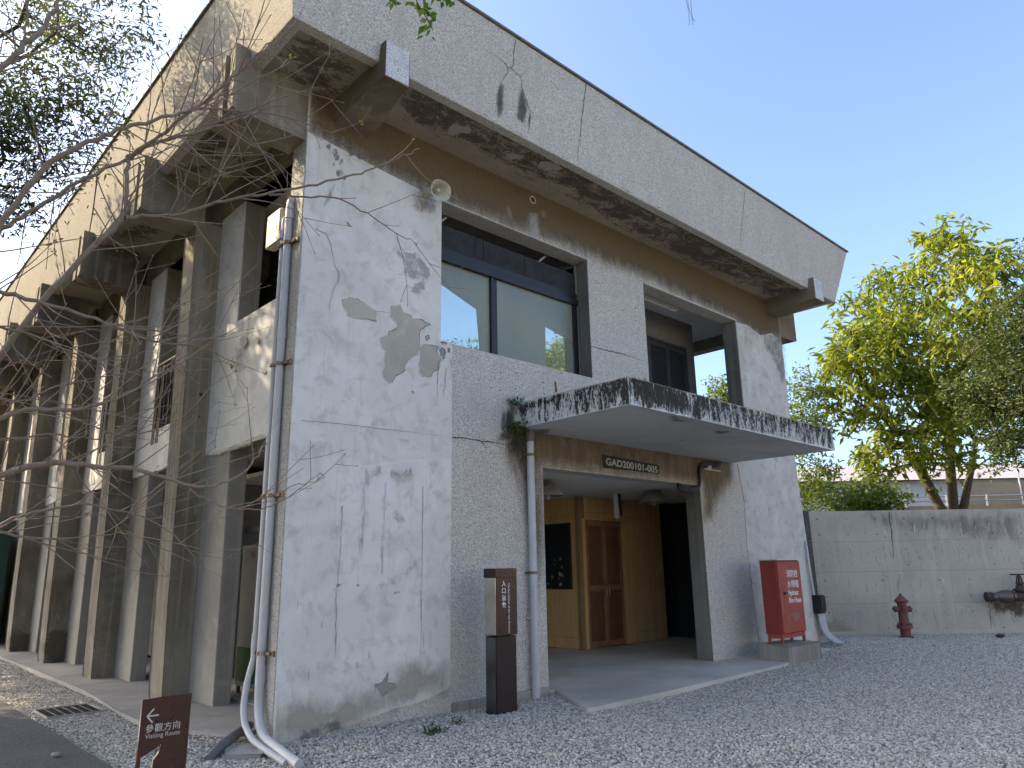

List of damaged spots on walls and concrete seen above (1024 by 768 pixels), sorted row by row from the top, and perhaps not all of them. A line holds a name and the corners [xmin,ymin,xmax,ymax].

crack [492,40,531,125]
water stain [275,36,799,336]
peeling [342,297,451,384]
water stain [508,375,833,514]
peeling [375,671,396,697]